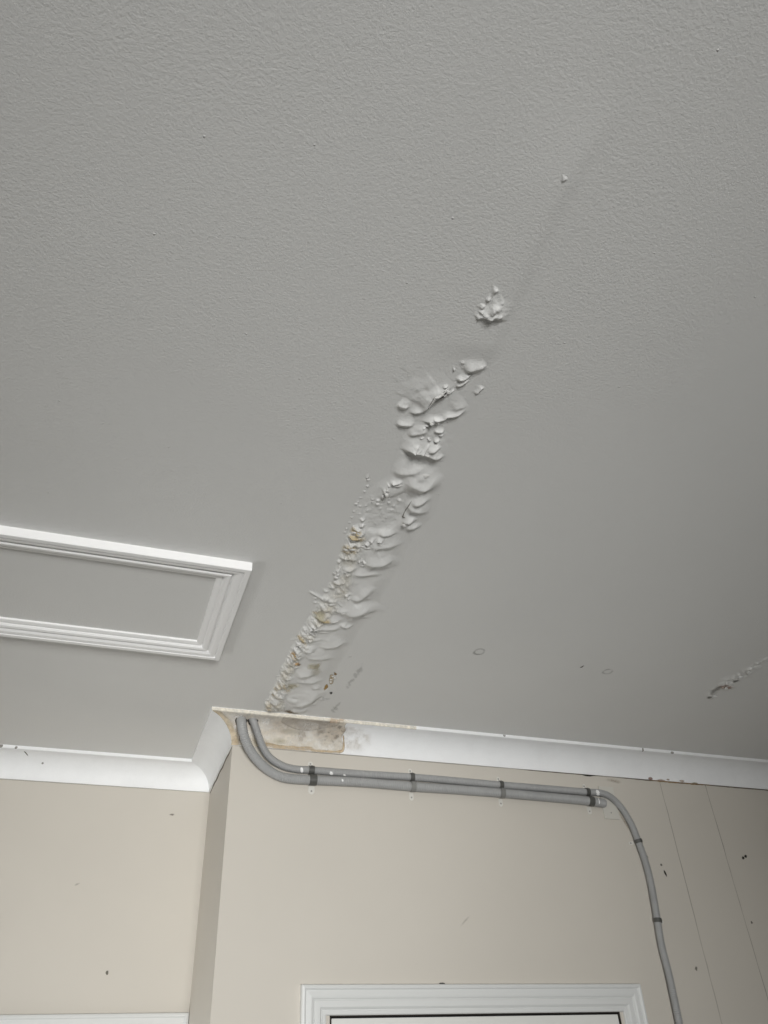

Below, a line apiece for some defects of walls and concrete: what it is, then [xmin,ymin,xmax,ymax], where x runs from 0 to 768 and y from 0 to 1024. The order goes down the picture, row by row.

water stain [212,704,416,754]